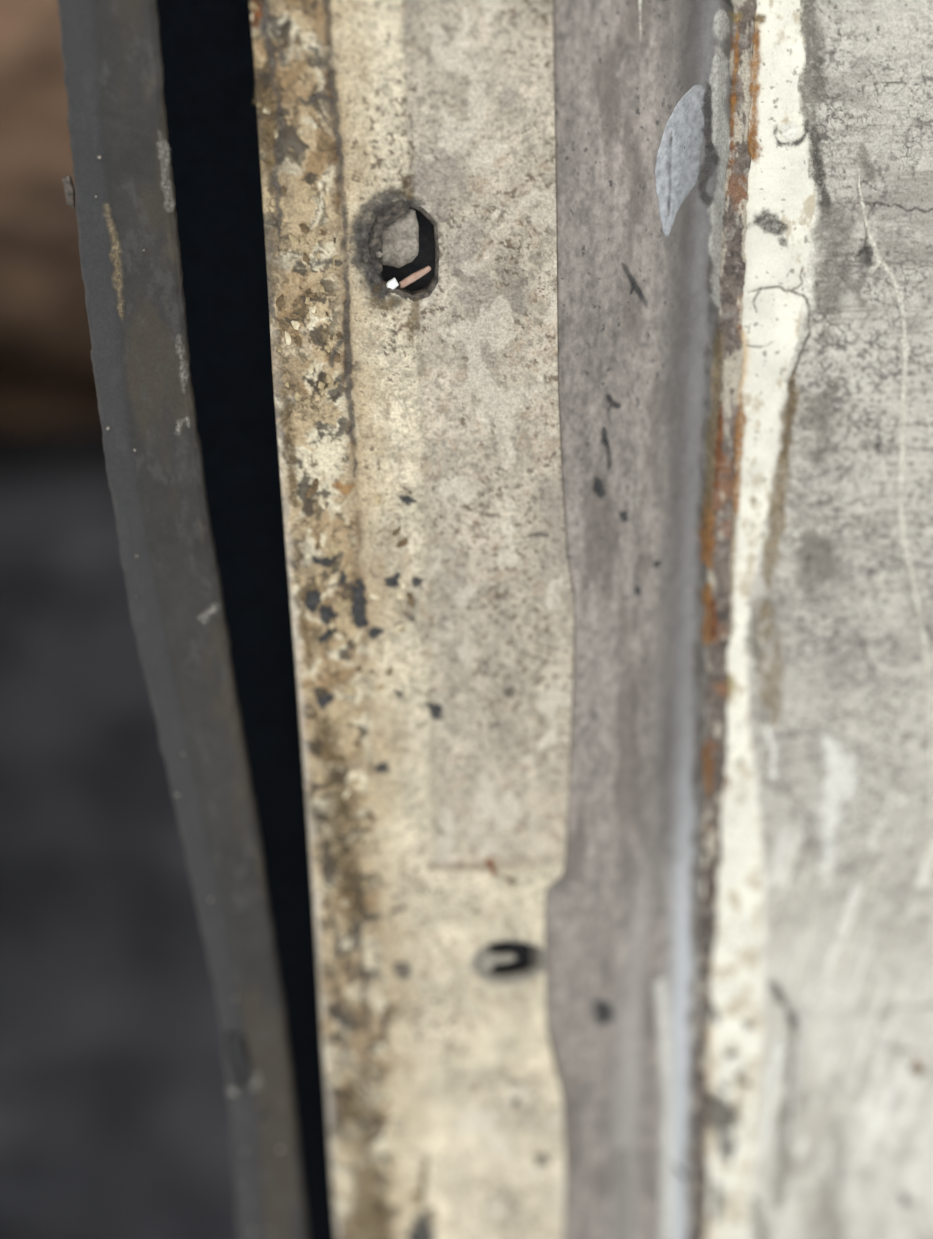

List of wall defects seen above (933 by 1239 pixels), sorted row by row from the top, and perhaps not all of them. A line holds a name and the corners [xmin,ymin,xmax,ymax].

rust [730,14,765,159]
crack [858,202,932,266]
rust [699,330,746,644]